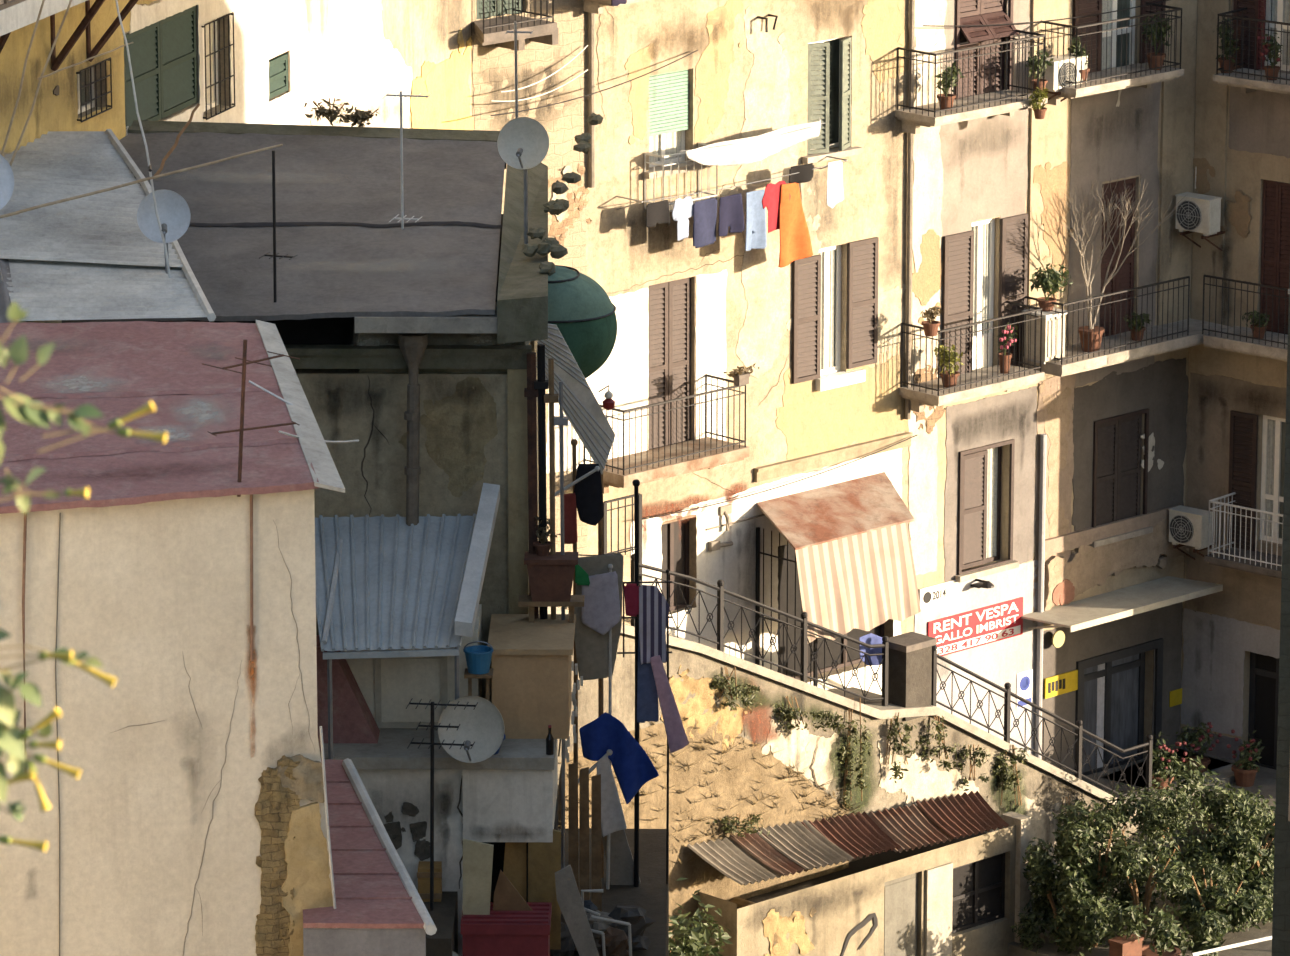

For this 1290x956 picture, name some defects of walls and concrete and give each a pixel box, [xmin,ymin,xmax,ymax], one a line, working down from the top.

peeling [410,28,474,130]
spalling [548,163,592,246]
peeling [1033,161,1074,299]
peeling [776,229,945,460]
crack [361,377,389,516]
crack [273,520,315,750]
crack [182,651,242,956]
spalling [254,754,333,956]
spalling [730,897,816,956]